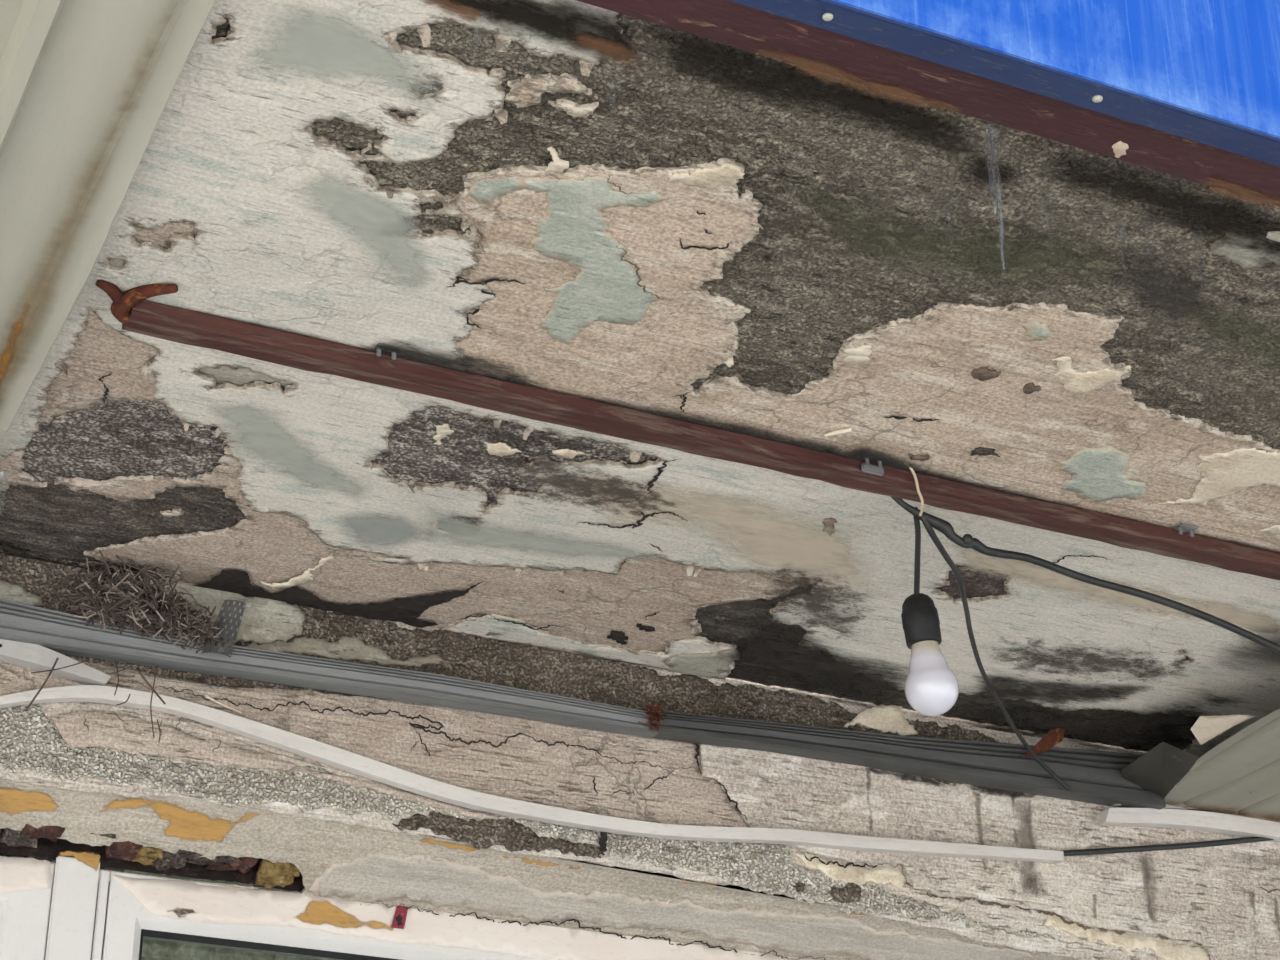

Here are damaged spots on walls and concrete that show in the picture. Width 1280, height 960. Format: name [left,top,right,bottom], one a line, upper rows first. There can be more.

flaking render [212,18,231,39]
corrosion [426,0,480,21]
corrosion [758,49,958,109]
corrosion [0,214,79,382]
flaking render [309,13,1280,552]
damp [363,342,533,388]
peeling [0,309,1199,751]
damp [732,627,906,706]
damp [978,676,1145,704]
crack [131,680,747,820]
crack [599,831,608,856]
spalling [0,704,1210,960]